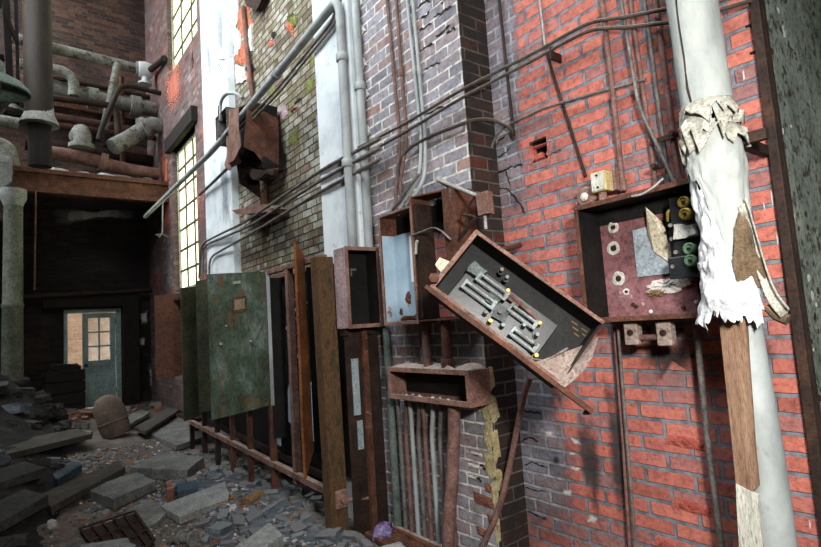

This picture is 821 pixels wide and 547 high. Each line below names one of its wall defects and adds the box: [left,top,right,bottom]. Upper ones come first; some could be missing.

crack [417,0,455,70]
crack [496,134,525,214]
hole [528,138,561,170]